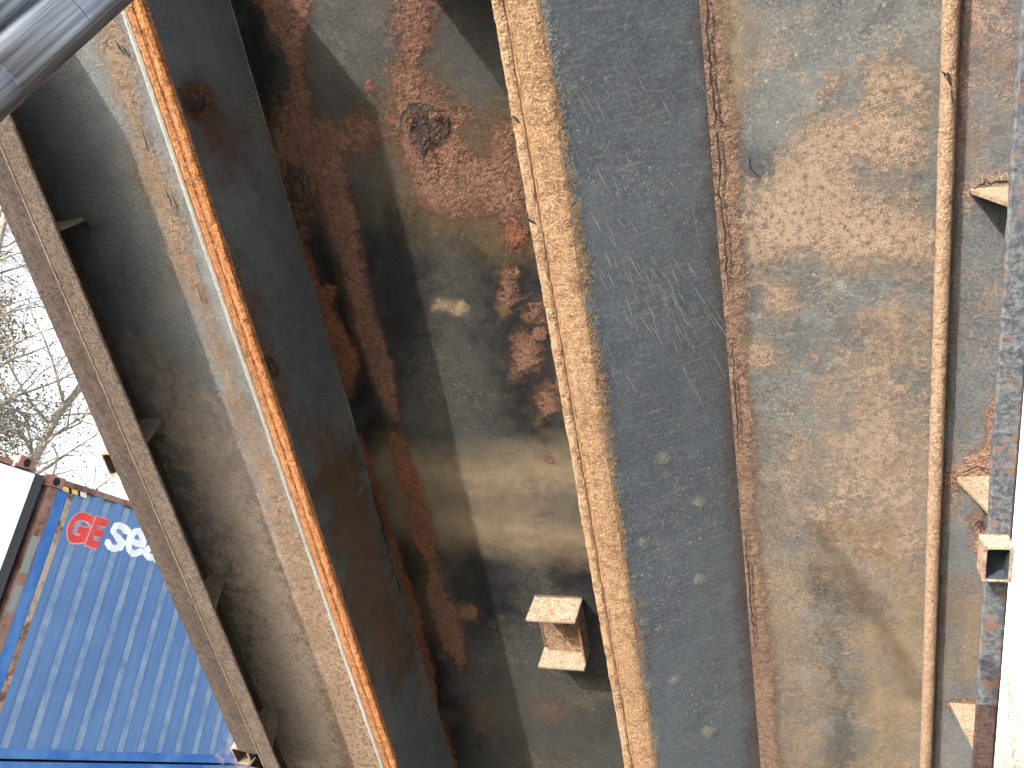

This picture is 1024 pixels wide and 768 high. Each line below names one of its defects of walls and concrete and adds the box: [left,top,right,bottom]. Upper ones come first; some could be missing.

corrosion [95,17,381,768]
corrosion [254,0,562,768]